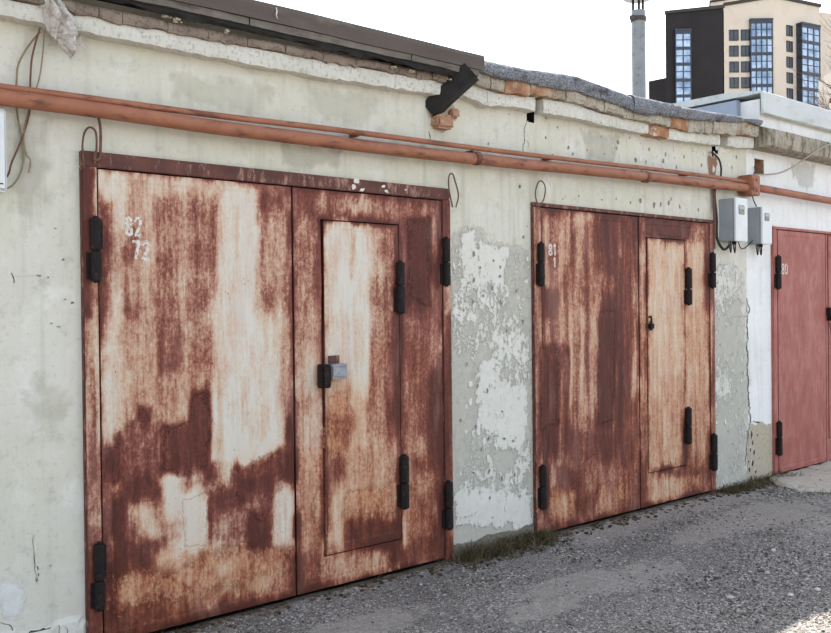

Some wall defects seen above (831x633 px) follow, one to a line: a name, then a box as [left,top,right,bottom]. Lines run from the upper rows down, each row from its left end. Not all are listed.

spalling [429,105,460,140]
peeling [451,226,561,557]
peeling [715,261,772,483]
rust [320,387,356,482]
rust [341,478,396,522]
rust [548,487,576,526]
rust [104,538,294,619]